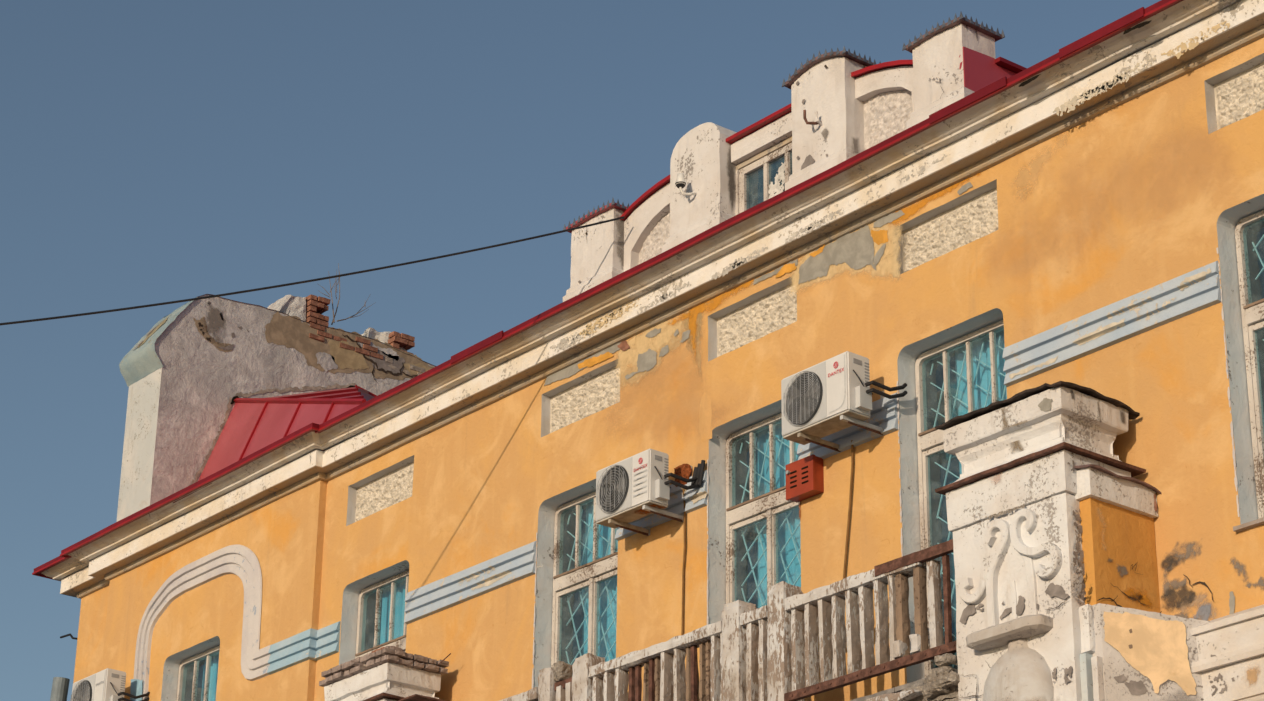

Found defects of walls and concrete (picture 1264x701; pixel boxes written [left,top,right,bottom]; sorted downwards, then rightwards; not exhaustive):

spalling [1053,21,1230,116]
spalling [709,246,768,281]
peeling [753,173,980,292]
flaking render [194,301,249,352]
spalling [550,281,691,352]
peeling [544,312,701,386]
flaking render [189,311,434,486]
peeling [1103,612,1238,700]